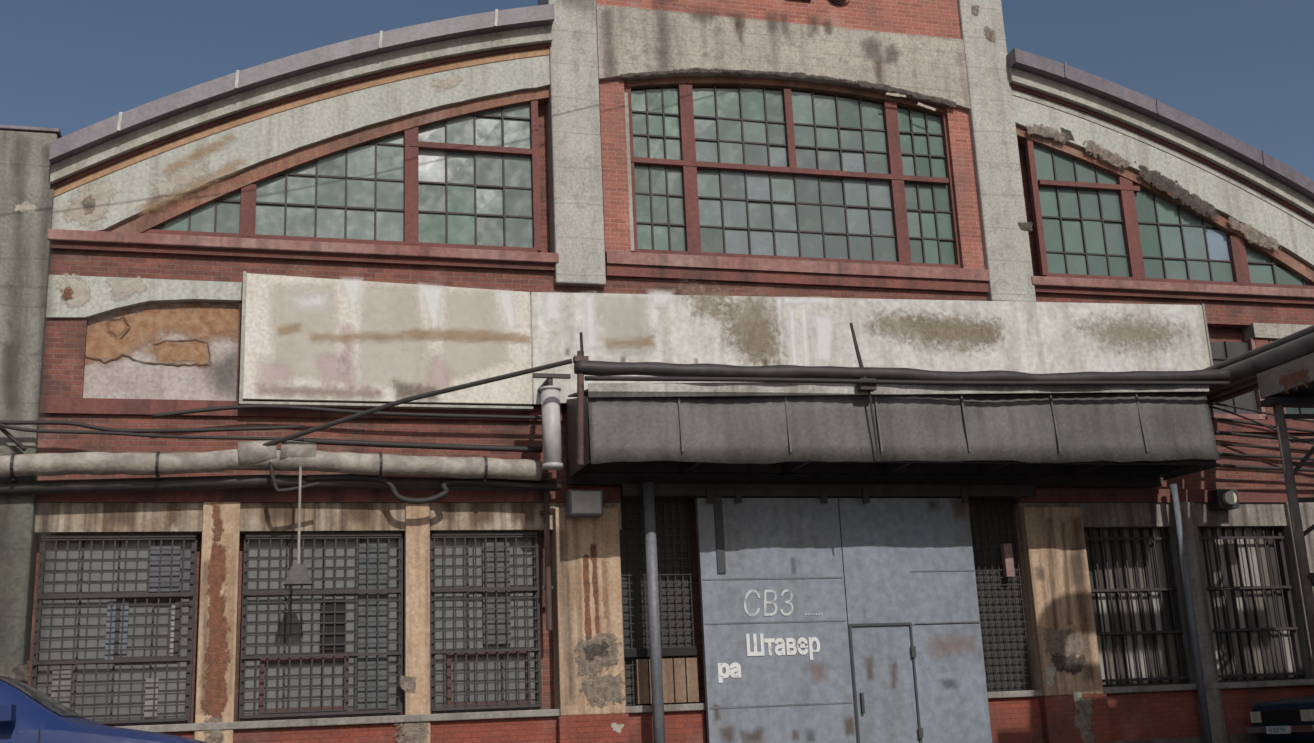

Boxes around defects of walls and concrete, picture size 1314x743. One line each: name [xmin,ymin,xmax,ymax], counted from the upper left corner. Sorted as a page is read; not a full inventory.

spalling [972,5,996,42]
peeling [64,181,118,229]
spalling [1026,124,1281,251]
spalling [57,273,90,308]
peeling [85,276,239,366]
peeling [200,503,232,743]
spalling [574,544,626,708]
spalling [1043,628,1089,687]
peeling [1071,691,1096,743]